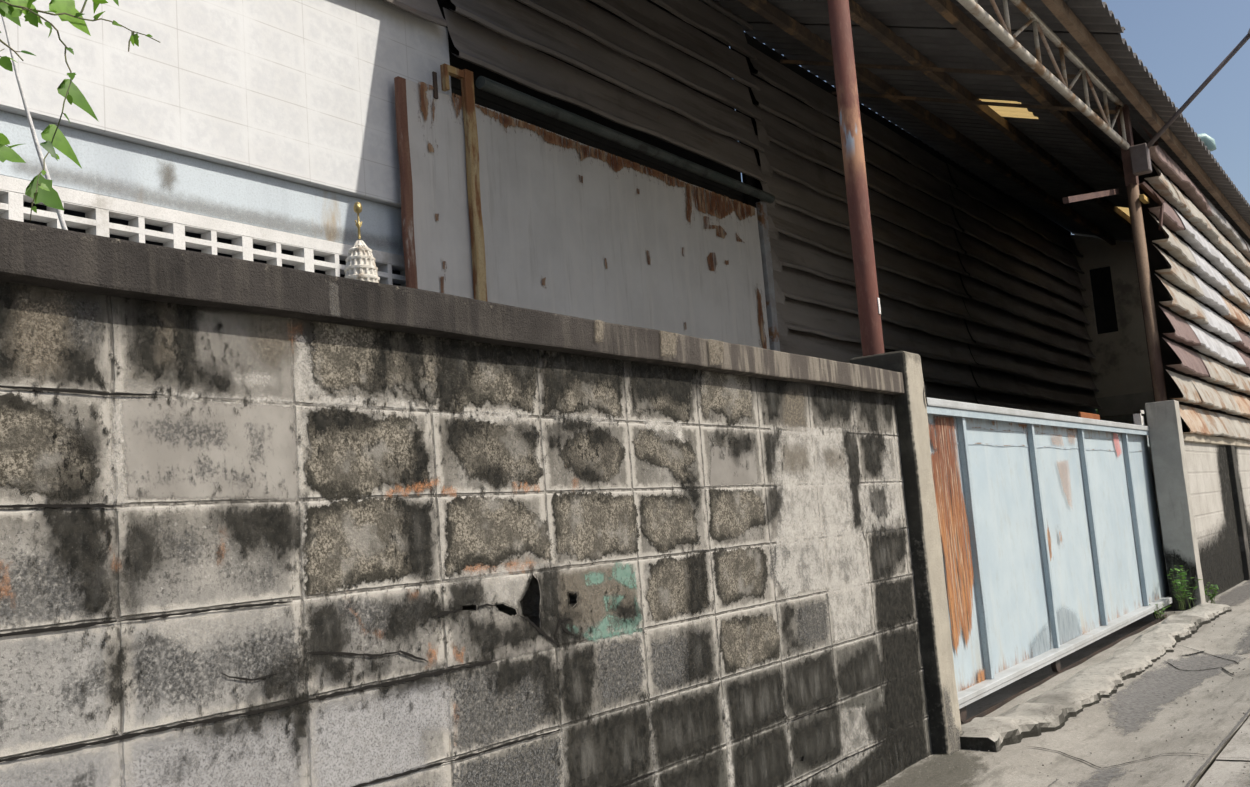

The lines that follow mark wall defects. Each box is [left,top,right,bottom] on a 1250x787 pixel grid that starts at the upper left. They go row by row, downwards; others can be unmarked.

corrosion [419,82,435,123]
corrosion [452,93,755,243]
corrosion [707,252,729,271]
peeling [293,321,780,674]
corrosion [928,416,974,655]
water stain [1164,445,1250,611]
crack [432,604,576,646]
crack [0,650,497,762]
water stain [1104,629,1250,735]